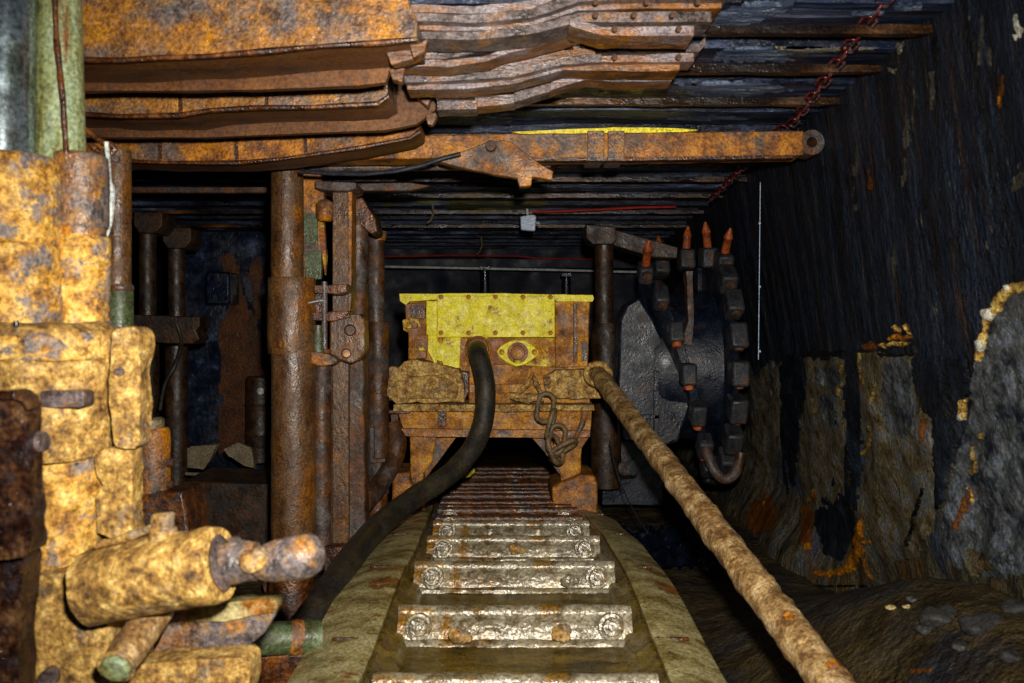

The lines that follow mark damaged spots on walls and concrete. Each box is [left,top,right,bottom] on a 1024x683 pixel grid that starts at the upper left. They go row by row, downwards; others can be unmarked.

corrosion [218,253,269,460]
corrosion [814,512,873,580]